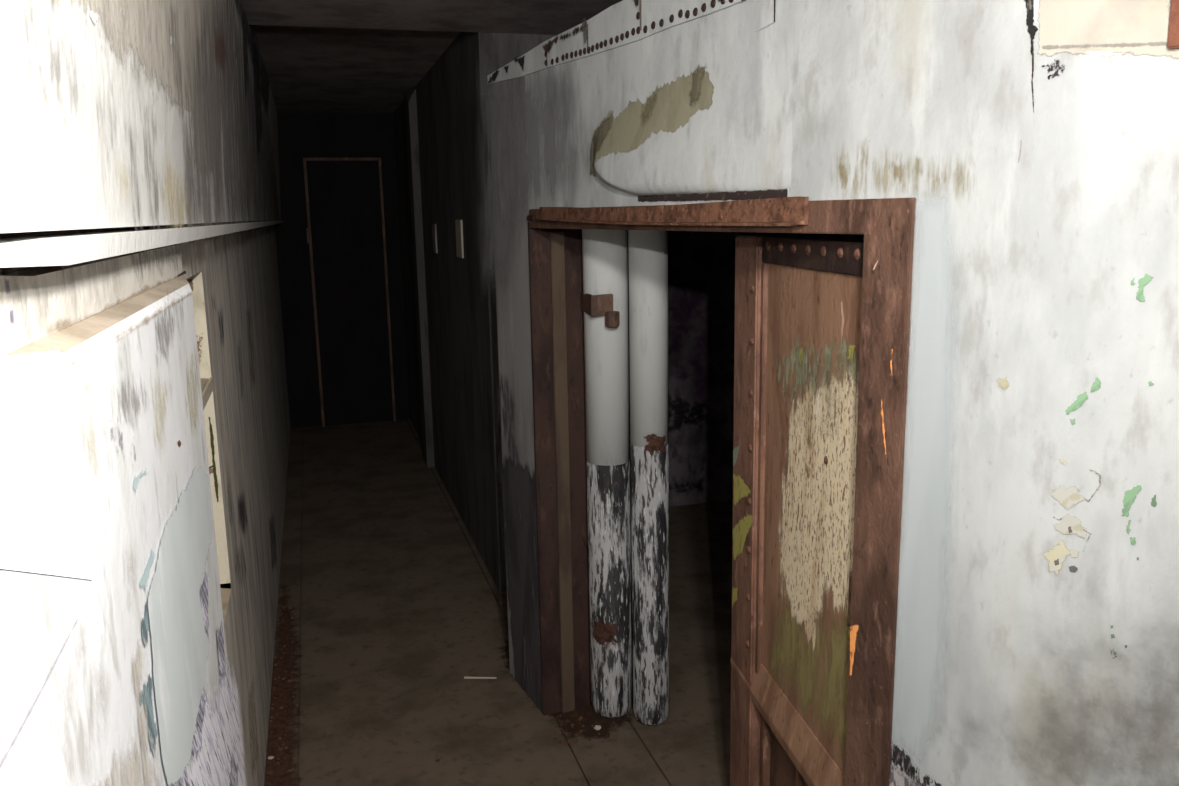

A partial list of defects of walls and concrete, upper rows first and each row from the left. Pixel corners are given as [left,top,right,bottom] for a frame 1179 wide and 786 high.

crack [1028,53,1036,112]
peeling [589,67,714,176]
peeling [1066,378,1101,425]
rust [644,433,666,455]
peeling [1044,470,1101,575]
peeling [1122,485,1157,560]
peeling [106,550,159,786]
peeling [175,571,247,786]
rust [592,619,618,645]